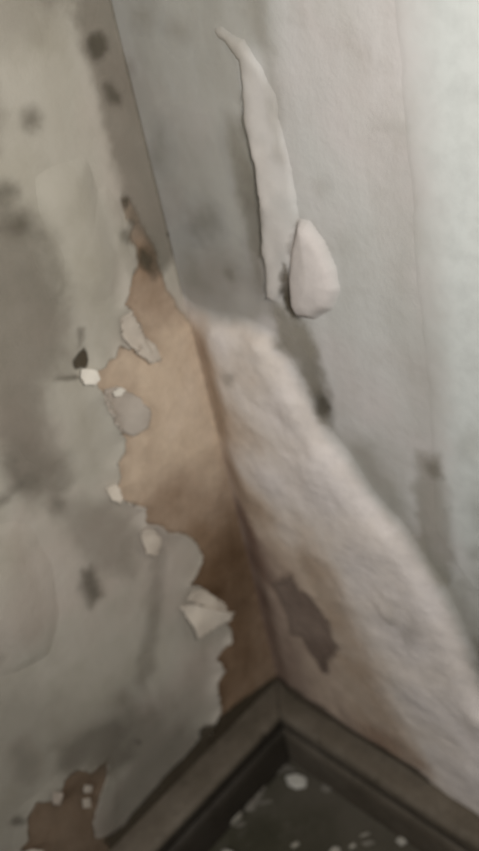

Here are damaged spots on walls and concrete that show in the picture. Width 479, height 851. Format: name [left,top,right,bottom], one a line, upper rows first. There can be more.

peeling [214,26,299,304]
flaking render [12,746,120,851]
flaking render [40,185,277,741]
leakage [183,295,479,815]